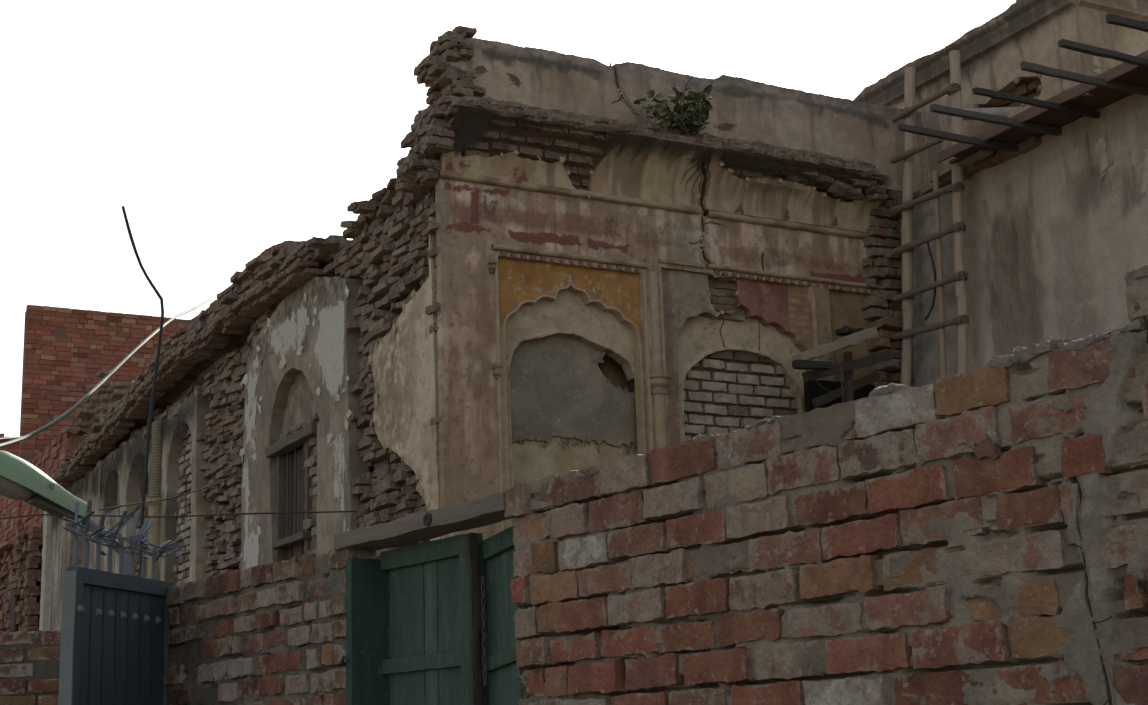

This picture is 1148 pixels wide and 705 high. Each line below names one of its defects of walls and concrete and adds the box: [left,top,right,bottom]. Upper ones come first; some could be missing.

crack [609,63,645,123]
spalling [460,117,614,199]
spalling [718,158,864,204]
spalling [70,190,440,579]
crack [1061,474,1114,705]